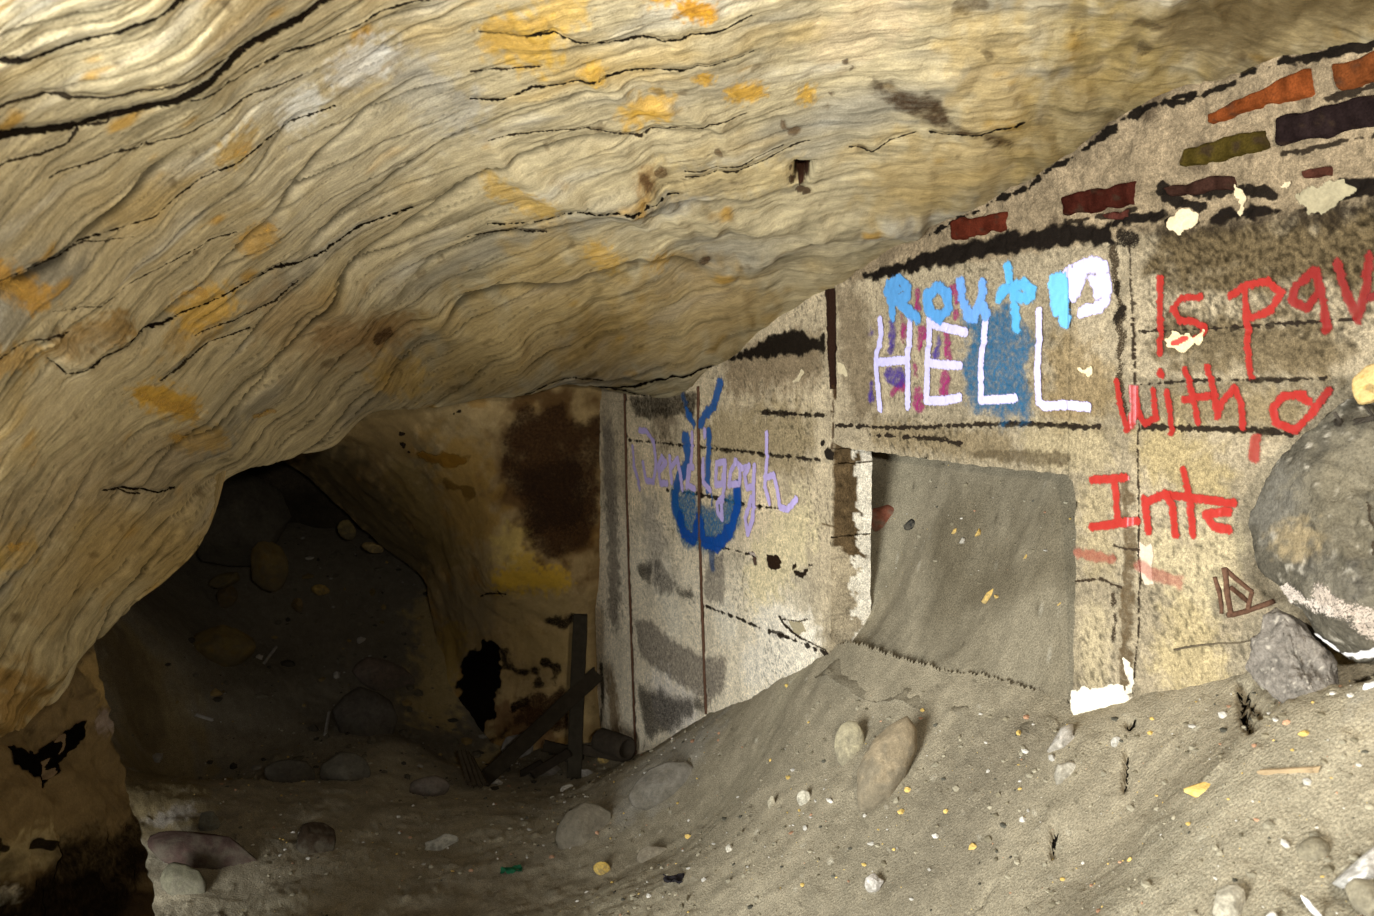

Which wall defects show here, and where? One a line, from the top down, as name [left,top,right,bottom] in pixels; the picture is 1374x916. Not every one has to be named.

damp [636,558,725,603]
damp [635,621,725,746]